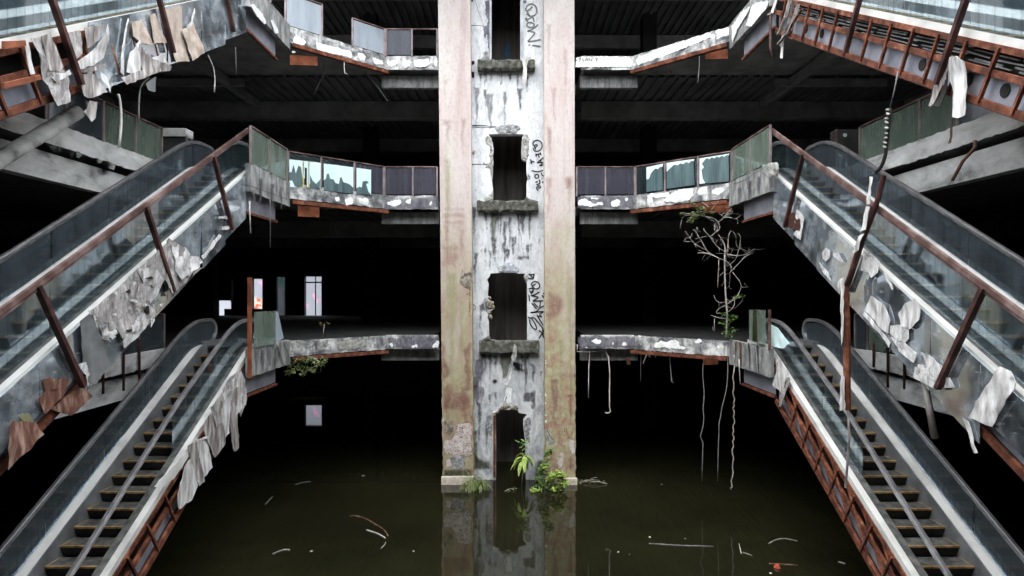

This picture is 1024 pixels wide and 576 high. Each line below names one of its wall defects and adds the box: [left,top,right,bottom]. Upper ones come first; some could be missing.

peeling [291,36,438,68]
peeling [471,0,489,48]
peeling [575,0,768,68]
leakage [475,74,529,123]
spalling [485,124,530,178]
spalling [497,262,528,282]
peeling [861,249,893,290]
peeling [318,339,366,350]
peeling [654,339,702,350]
peeling [863,296,954,388]
peeling [442,417,472,469]